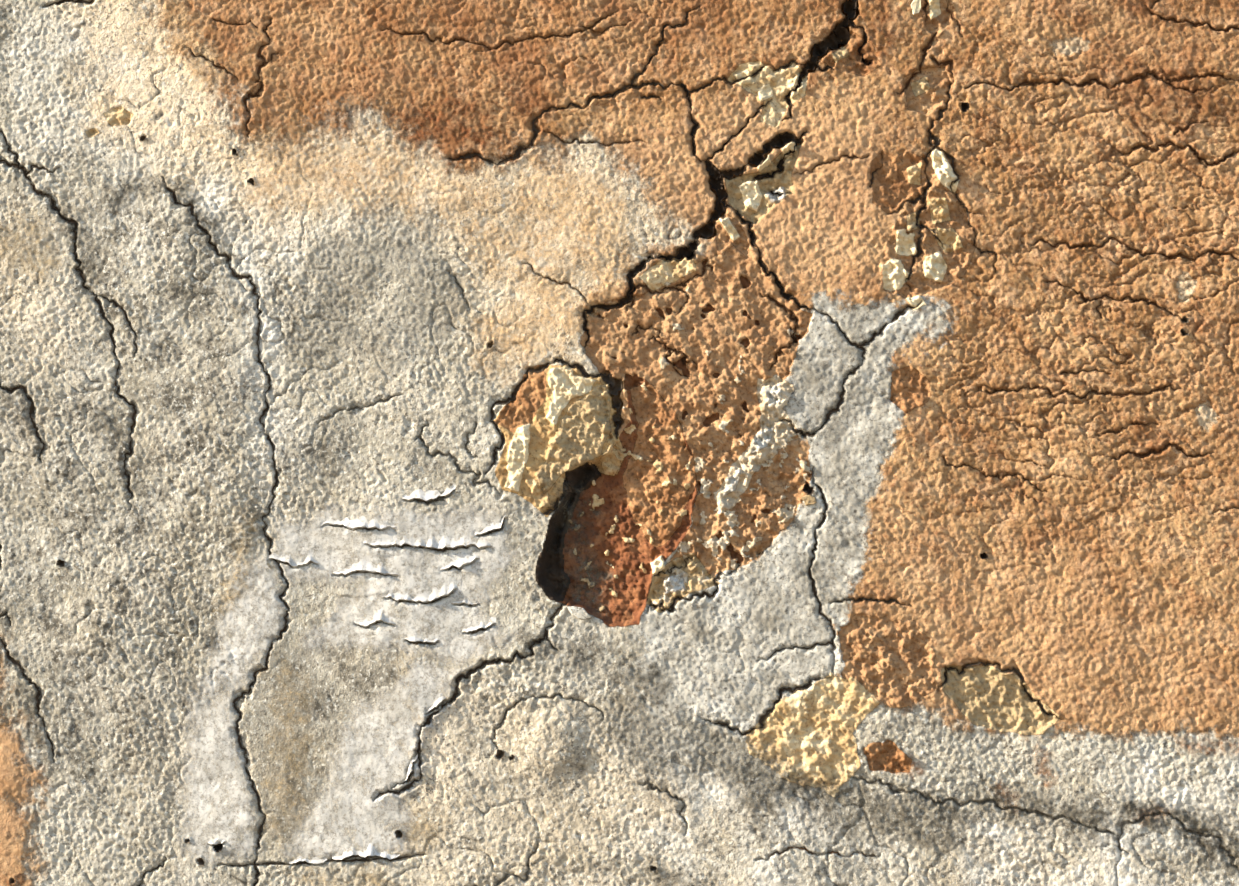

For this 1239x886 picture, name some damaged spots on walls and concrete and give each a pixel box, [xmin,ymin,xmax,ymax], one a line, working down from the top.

spalling [904,66,953,114]
crack [0,131,137,510]
spalling [494,141,812,627]
crack [384,0,1239,504]
spalling [870,148,977,310]
crack [164,181,424,886]
peeling [321,514,506,628]
peeling [402,484,456,503]
crack [374,599,570,800]
crack [648,555,739,612]
crack [704,469,911,735]
spalling [746,613,1060,797]